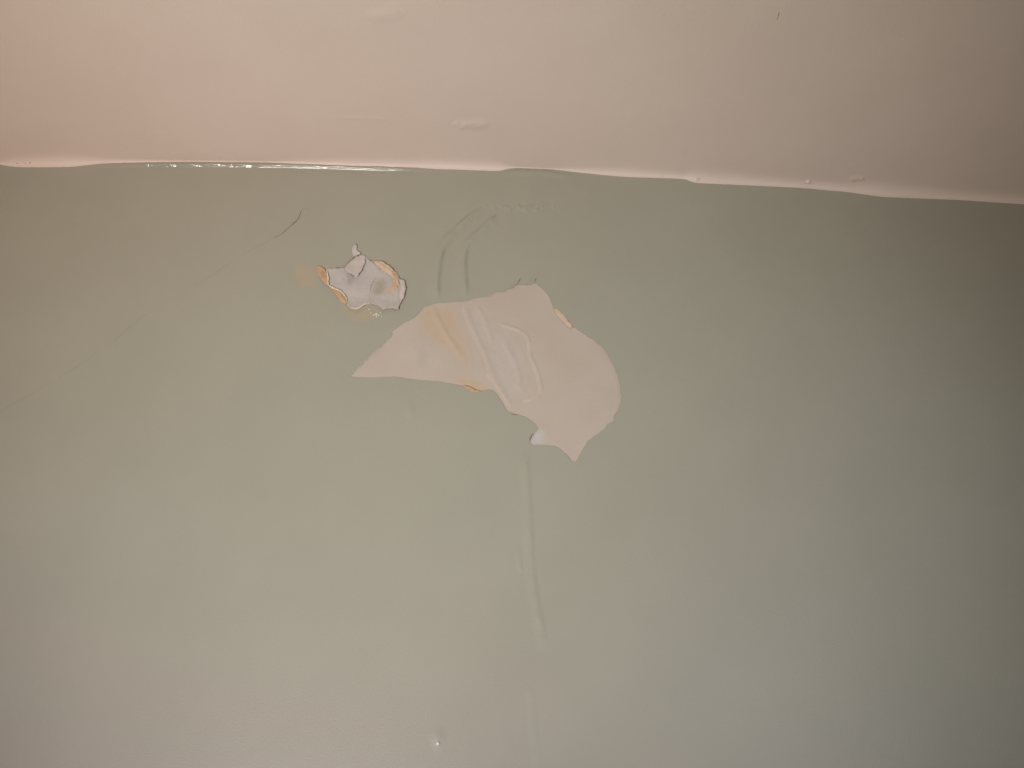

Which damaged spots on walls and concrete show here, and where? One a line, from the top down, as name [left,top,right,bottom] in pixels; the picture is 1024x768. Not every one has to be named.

peeling [315,244,406,317]
peeling [351,279,621,462]